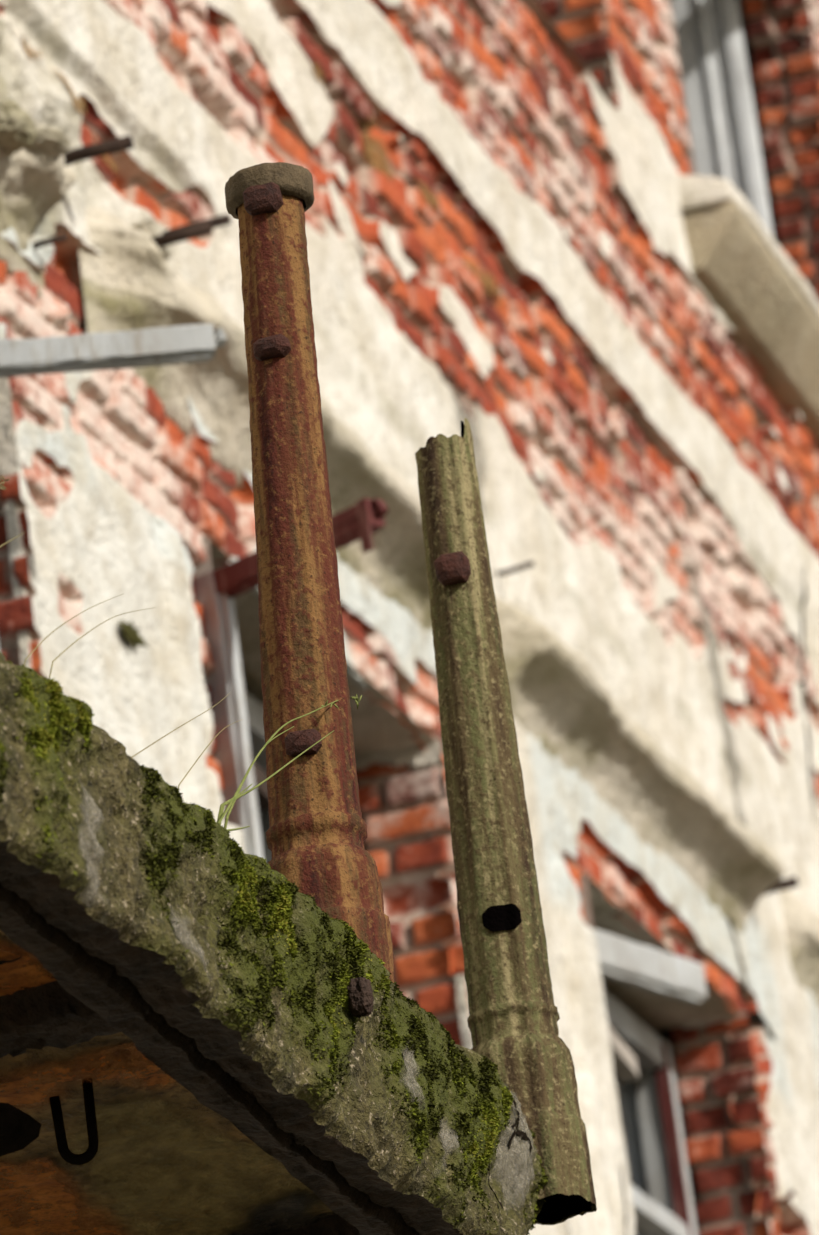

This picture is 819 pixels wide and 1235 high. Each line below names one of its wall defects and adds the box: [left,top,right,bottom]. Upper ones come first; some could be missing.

flaking render [79,94,215,247]
flaking render [103,0,819,767]
flaking render [0,368,256,792]
efflorescence [80,790,103,899]
flaking render [340,601,468,1047]
corrosion [0,944,57,996]
damp [171,911,205,960]
corrosion [0,1046,173,1108]
efflorescence [403,1052,420,1096]
flaking render [561,819,811,1235]
damp [441,1127,458,1149]
damp [496,1100,534,1196]